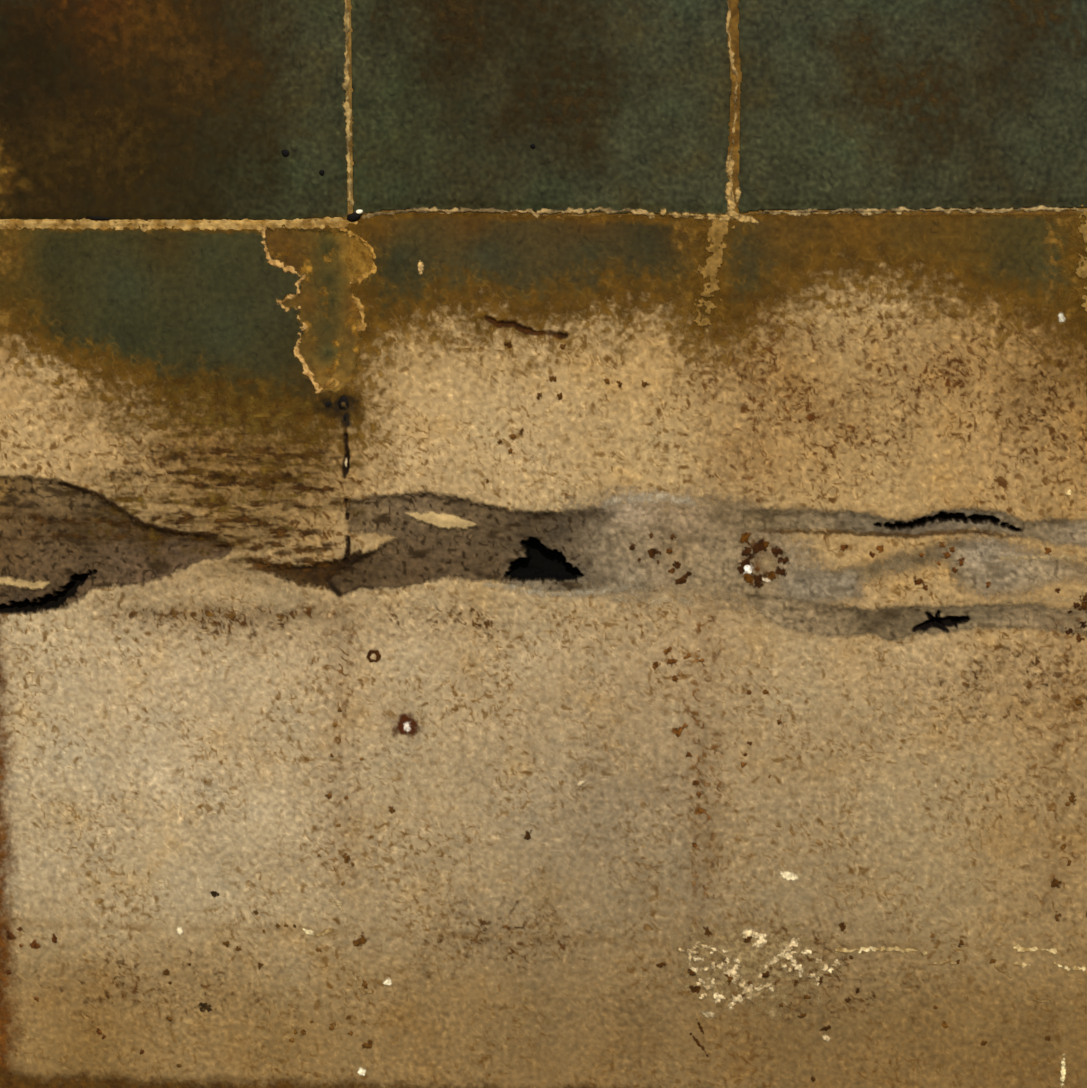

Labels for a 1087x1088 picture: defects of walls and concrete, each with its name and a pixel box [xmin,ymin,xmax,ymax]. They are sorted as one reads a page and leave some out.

peeling [261,0,1087,427]
corrosion [733,337,822,436]
corrosion [857,344,969,398]
corrosion [995,356,1083,445]
damp [30,514,138,539]
damp [151,446,336,574]
crack [342,433,350,562]
spalling [245,491,690,596]
spalling [742,508,1087,559]
crack [874,512,1021,531]
crack [913,611,970,633]
damp [675,921,840,1017]